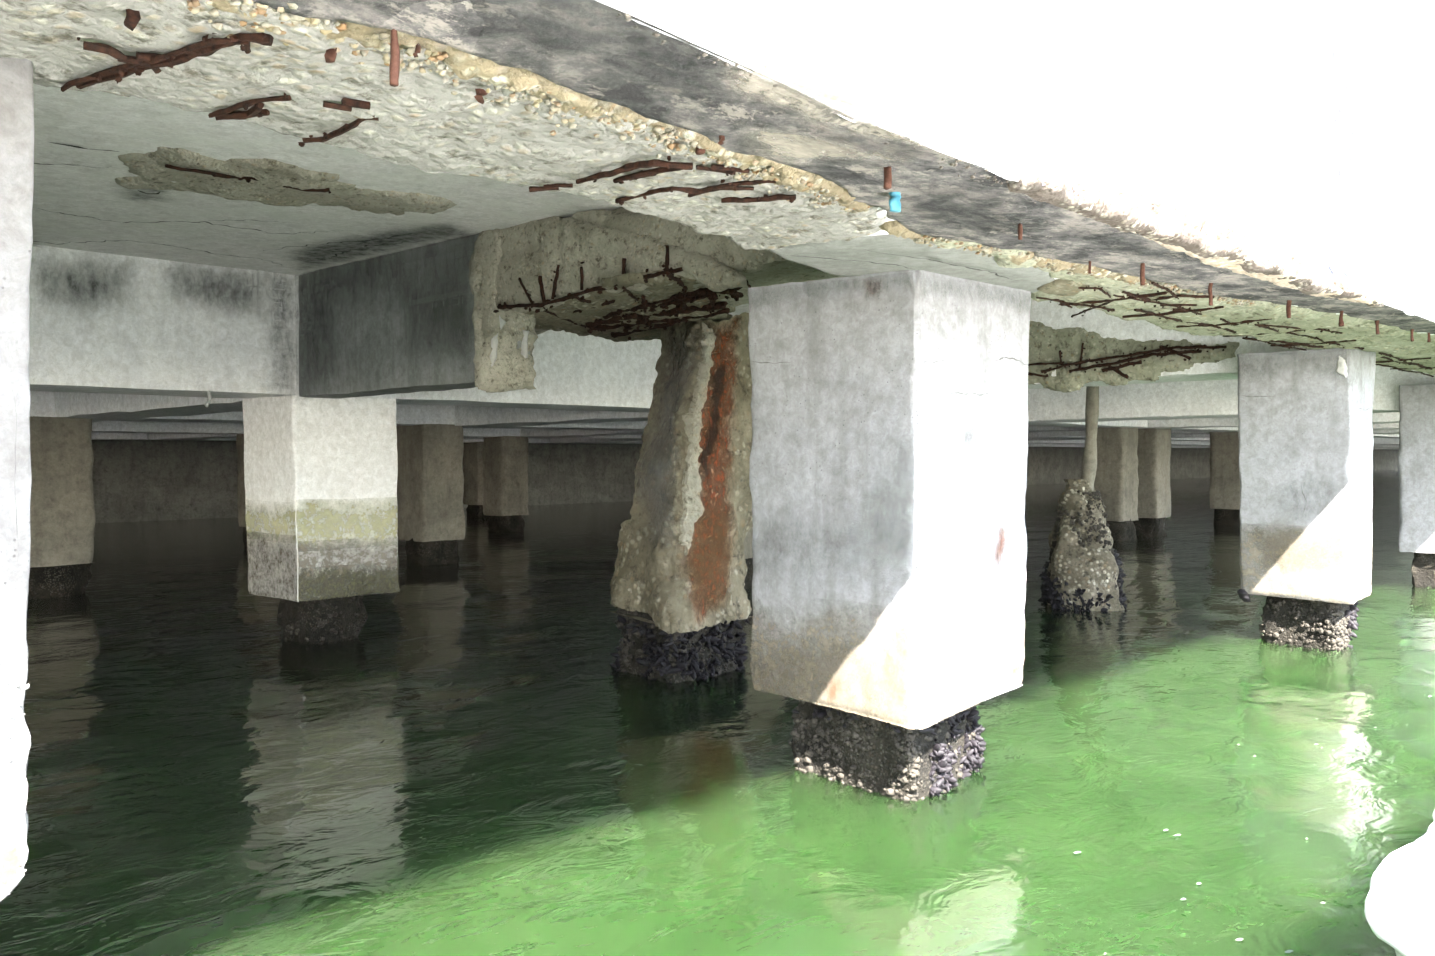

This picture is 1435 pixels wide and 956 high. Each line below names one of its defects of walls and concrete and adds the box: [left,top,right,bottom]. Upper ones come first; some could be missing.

leakage [44,264,117,300]
leakage [246,534,398,602]
spalling [468,216,751,556]
corrosion [685,318,739,620]
spalling [0,0,1435,393]